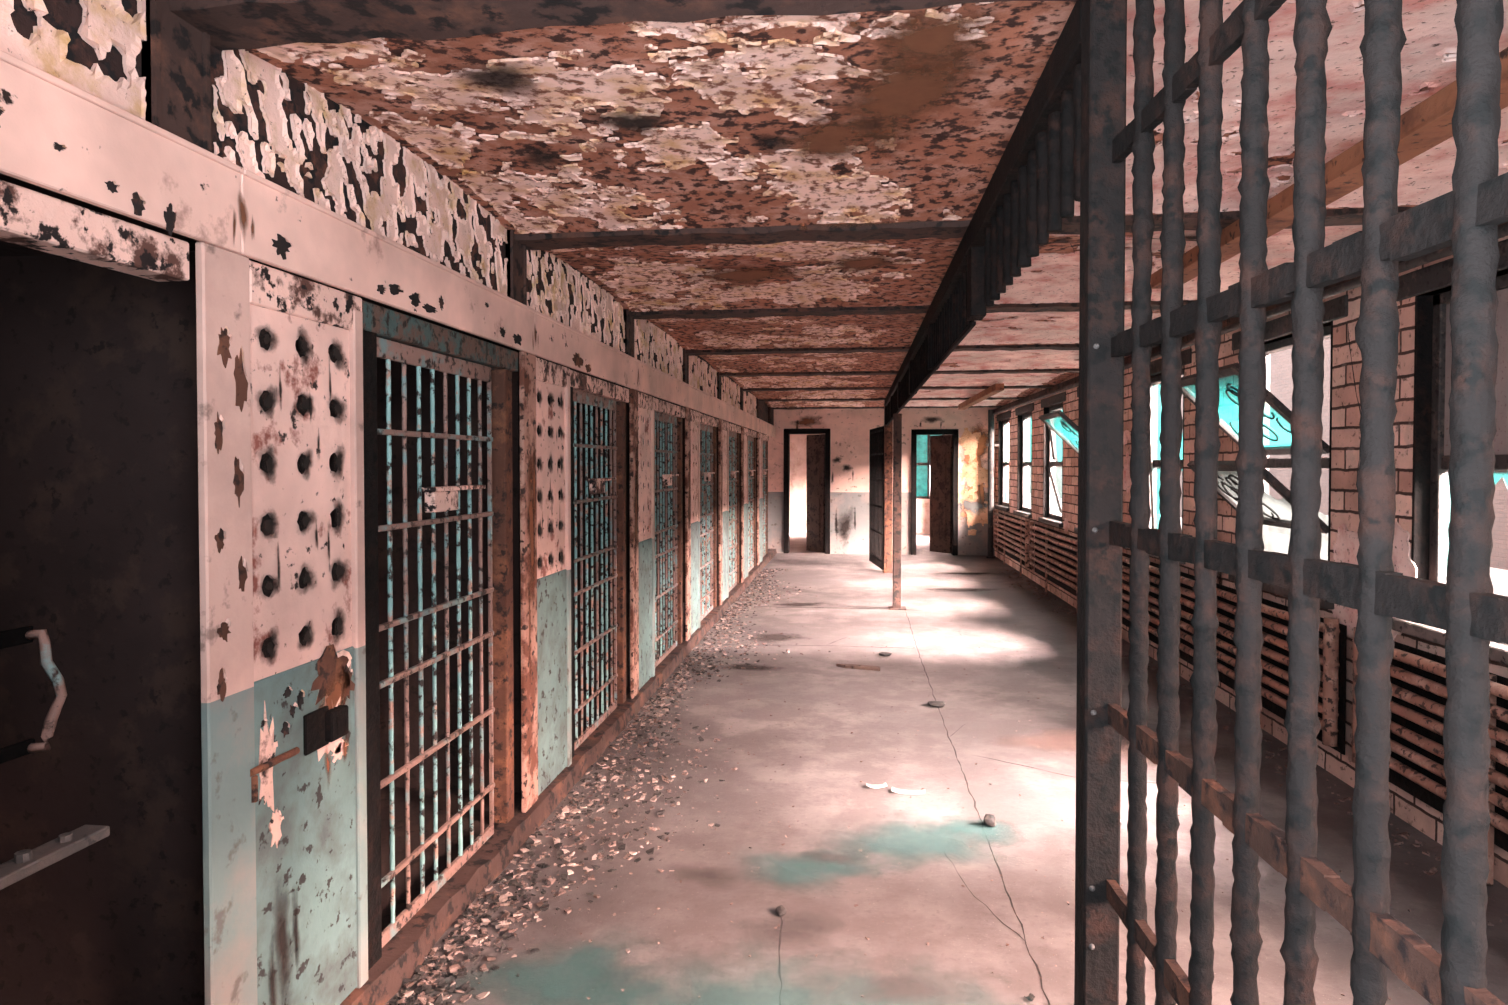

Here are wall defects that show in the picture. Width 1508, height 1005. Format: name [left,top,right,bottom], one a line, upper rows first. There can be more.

peeling [0,0,147,120]
peeling [212,2,995,417]
peeling [259,643,355,848]
crack [792,607,1076,1005]
crack [776,917,784,987]